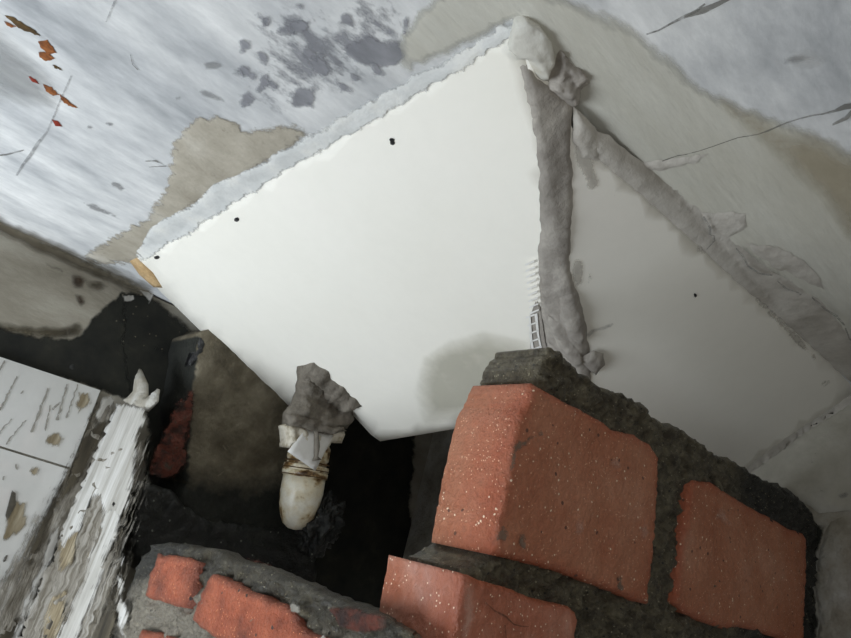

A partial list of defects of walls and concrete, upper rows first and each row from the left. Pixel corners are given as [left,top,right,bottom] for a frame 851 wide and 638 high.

rust [4,15,61,70]
rust [29,76,77,108]
leakage [239,66,278,107]
leakage [258,7,405,108]
crack [647,0,729,35]
crack [665,103,851,161]
leakage [0,221,191,638]
leakage [315,417,415,608]